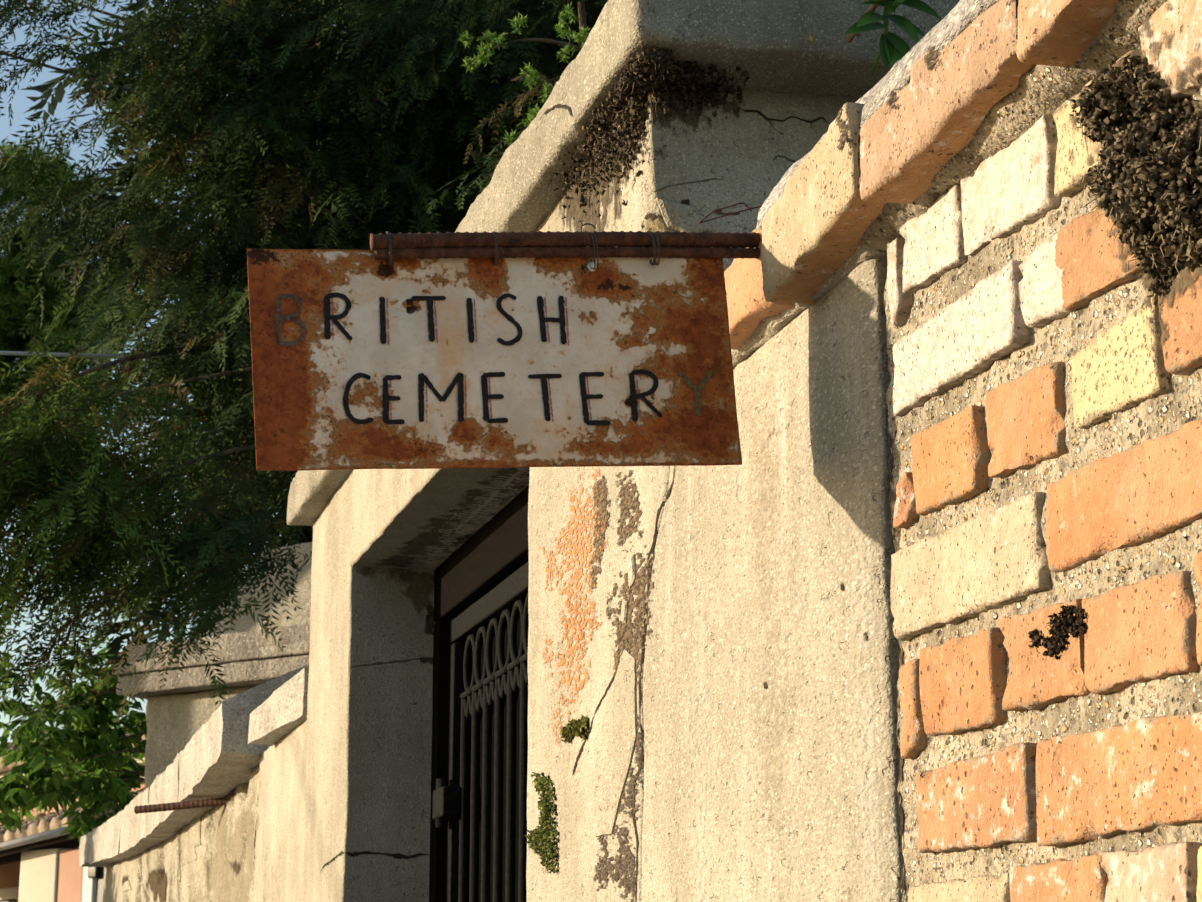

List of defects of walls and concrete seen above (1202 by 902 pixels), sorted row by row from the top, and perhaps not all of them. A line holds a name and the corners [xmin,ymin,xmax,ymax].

damp [650,83,743,159]
damp [565,153,621,232]
spalling [641,198,722,233]
corrosion [539,468,608,747]
crack [572,466,675,902]
crack [320,851,428,872]